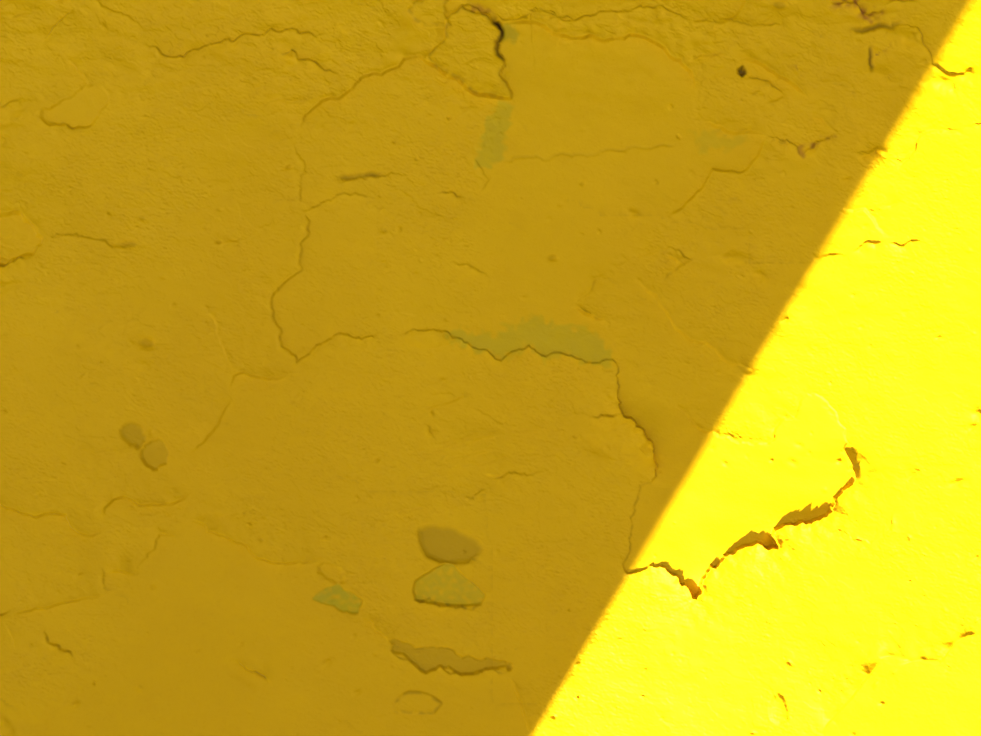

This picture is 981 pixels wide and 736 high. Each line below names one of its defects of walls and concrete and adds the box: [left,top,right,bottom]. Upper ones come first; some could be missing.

peeling [431,2,865,607]
peeling [311,560,365,617]
peeling [411,565,488,616]
peeling [386,637,541,736]